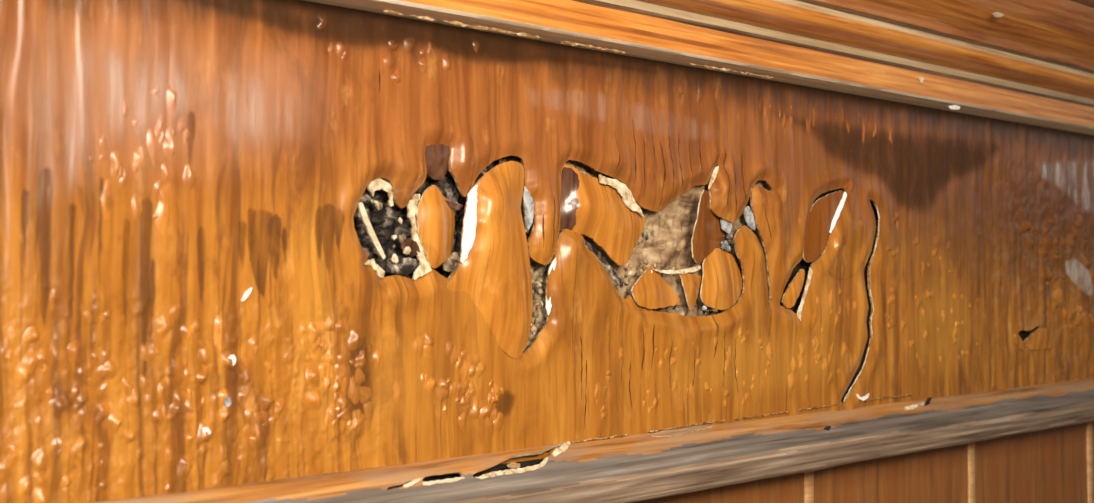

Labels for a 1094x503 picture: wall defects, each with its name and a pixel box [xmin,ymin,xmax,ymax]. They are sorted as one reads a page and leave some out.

spalling [353,156,522,279]
spalling [521,200,533,240]
spalling [558,160,844,316]
spalling [523,258,553,352]
crack [841,200,880,403]